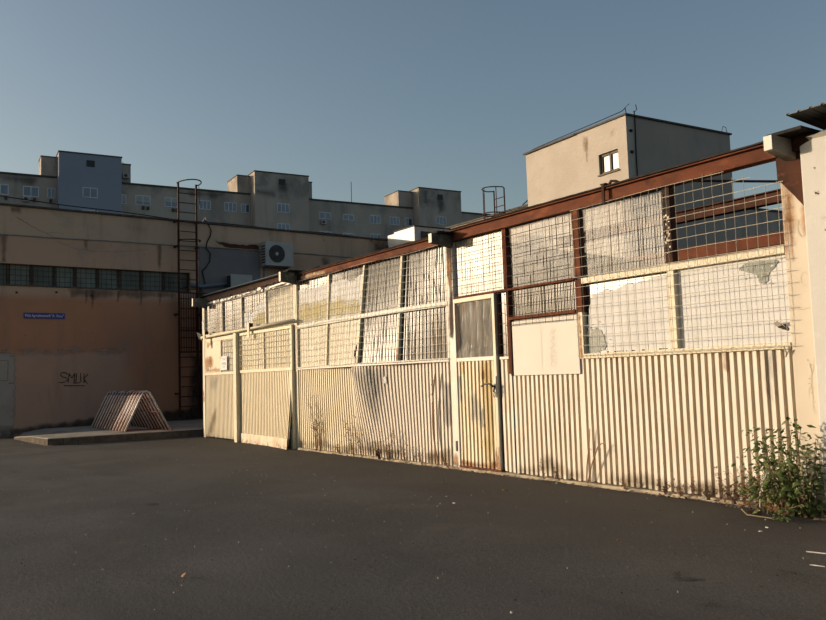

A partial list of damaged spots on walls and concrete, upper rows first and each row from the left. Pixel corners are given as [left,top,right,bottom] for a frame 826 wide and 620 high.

corrosion [786,190,806,237]